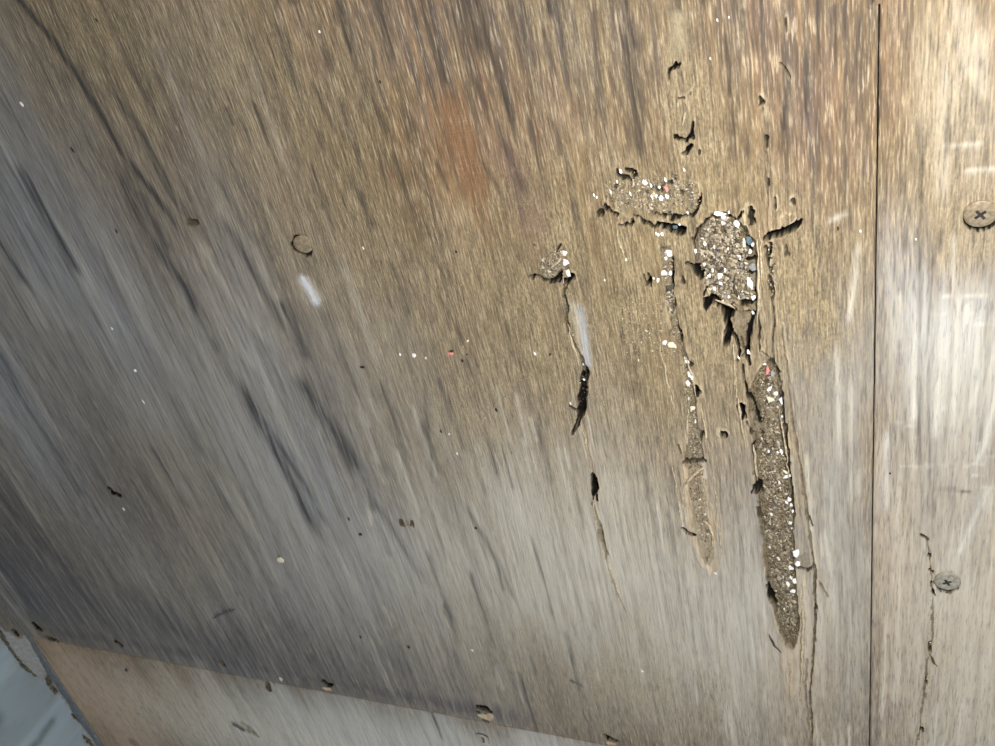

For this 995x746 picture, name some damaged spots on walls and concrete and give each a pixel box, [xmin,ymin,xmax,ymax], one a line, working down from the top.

spalling [589,158,725,579]
peeling [733,219,752,247]
spalling [731,347,809,704]
crack [909,528,945,746]